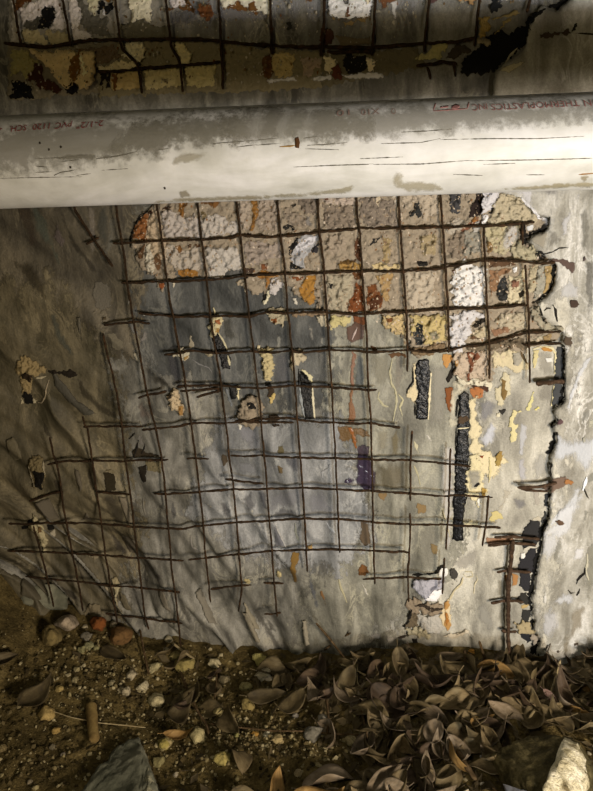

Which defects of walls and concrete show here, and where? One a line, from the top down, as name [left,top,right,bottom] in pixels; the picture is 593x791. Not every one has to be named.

peeling [220,0,273,15]
peeling [328,0,374,19]
peeling [29,0,192,95]
spalling [449,193,538,257]
rust [339,238,383,342]
rust [338,352,370,456]
rust [445,387,453,412]
rust [467,352,488,399]
rust [415,601,452,631]
peeling [398,565,471,640]
rust [486,535,540,654]
spalling [513,482,557,643]